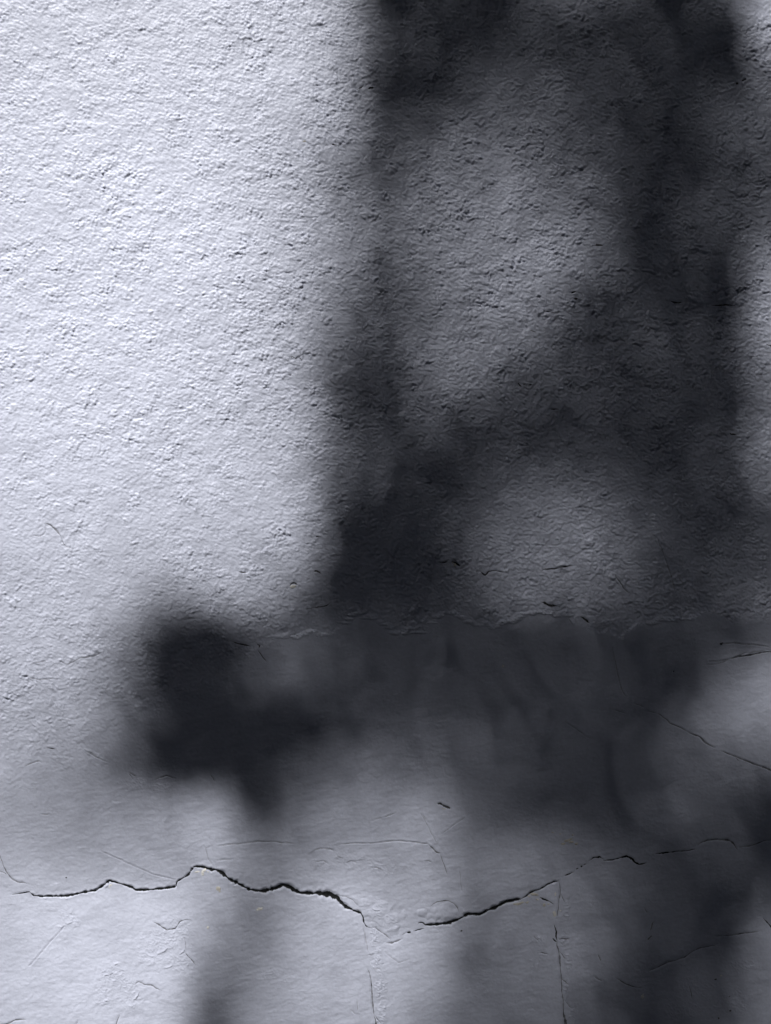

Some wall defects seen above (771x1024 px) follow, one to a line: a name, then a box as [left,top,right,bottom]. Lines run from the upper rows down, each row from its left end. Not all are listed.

crack [711,643,771,665]
crack [612,703,771,771]
crack [0,839,768,1024]